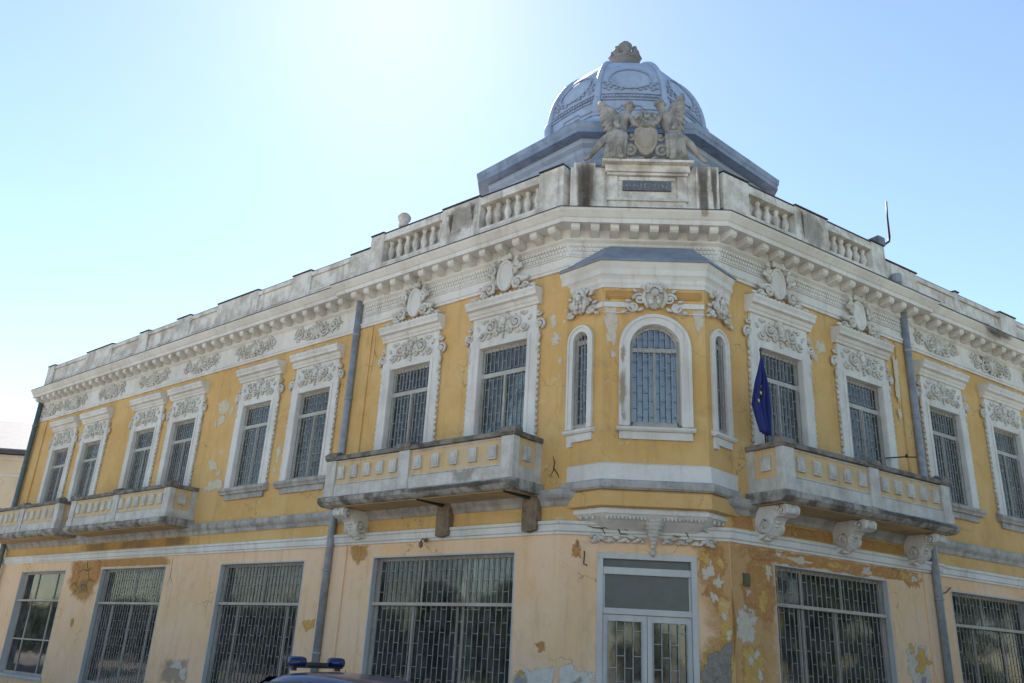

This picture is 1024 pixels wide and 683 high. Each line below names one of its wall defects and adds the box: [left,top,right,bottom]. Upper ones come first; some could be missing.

peeling [699,545,768,683]
peeling [512,663,595,683]
peeling [906,641,933,683]